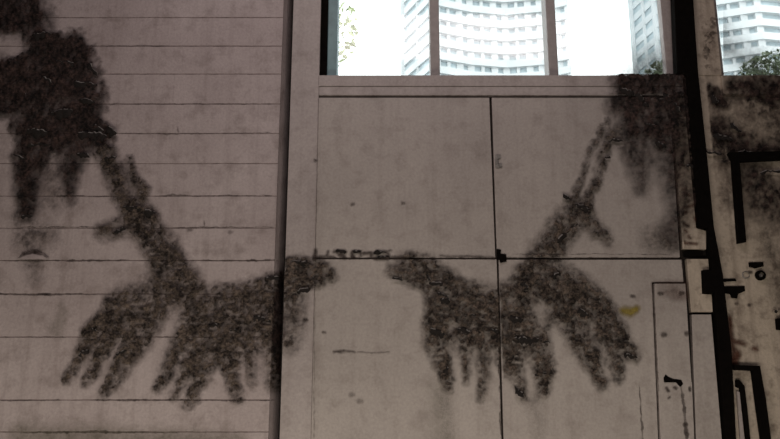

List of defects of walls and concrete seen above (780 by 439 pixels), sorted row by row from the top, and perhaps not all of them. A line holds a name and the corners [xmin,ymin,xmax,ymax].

damp [0,0,335,407]
damp [387,73,696,400]
damp [707,74,780,166]
damp [732,162,780,222]